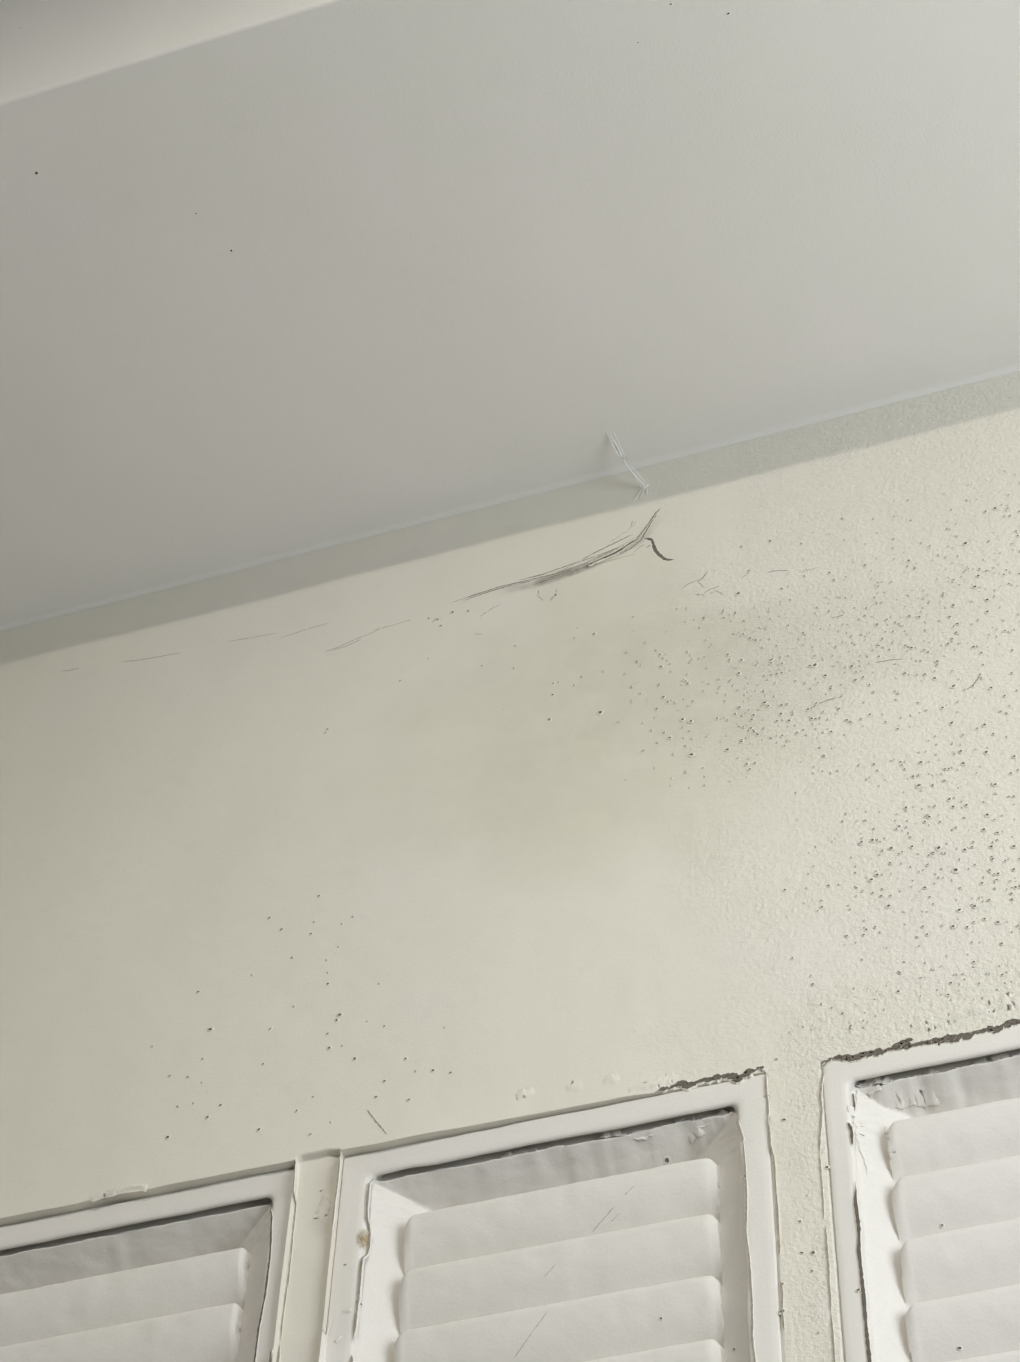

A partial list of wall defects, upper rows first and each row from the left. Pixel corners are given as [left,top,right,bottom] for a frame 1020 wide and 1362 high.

crack [459,508,819,601]